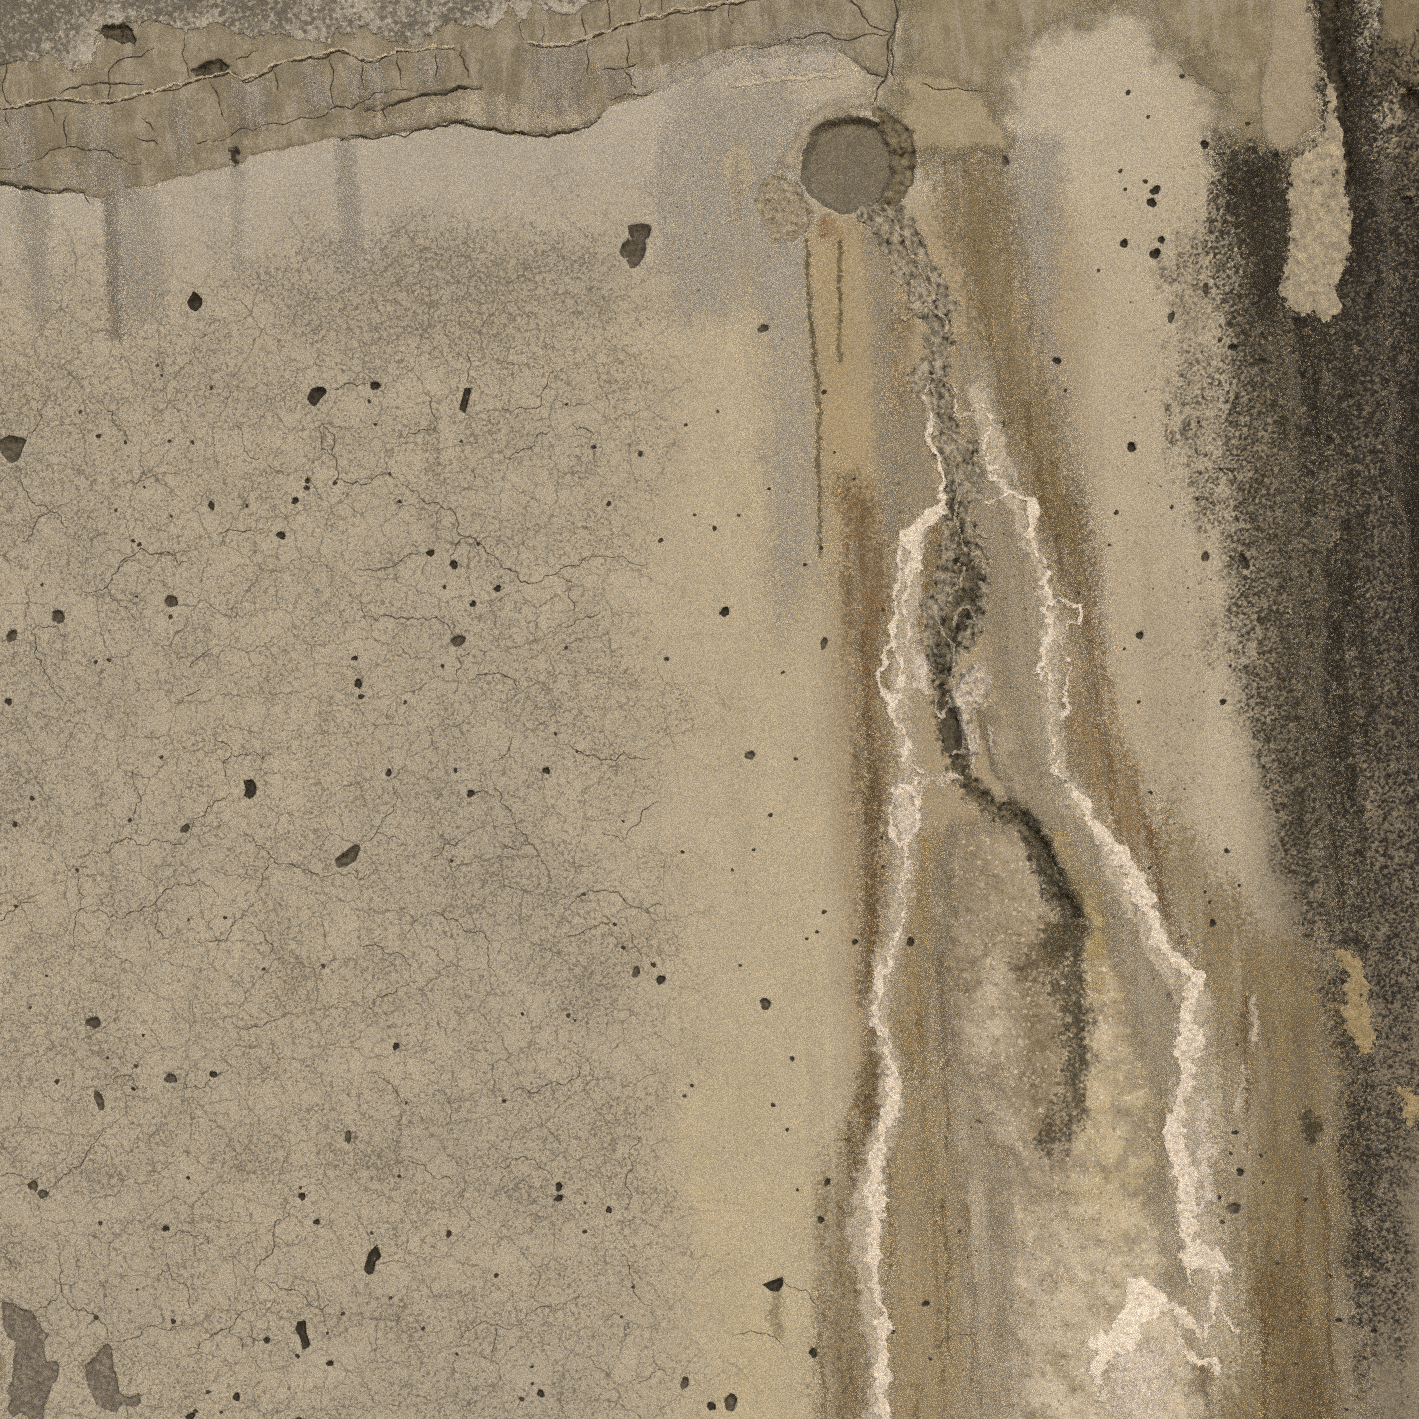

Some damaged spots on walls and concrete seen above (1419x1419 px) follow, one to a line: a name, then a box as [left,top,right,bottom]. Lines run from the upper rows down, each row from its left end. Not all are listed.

crack [0,0,989,204]
peeling [0,0,1322,198]
spalling [755,174,814,245]
water stain [999,134,1067,422]
crack [319,371,647,627]
water stain [1162,0,1419,1392]
crack [72,733,398,953]
crack [474,737,662,962]
water stain [844,223,1240,1419]
peeling [2,1300,59,1419]
peeling [84,1344,141,1413]
crack [38,1206,332,1349]